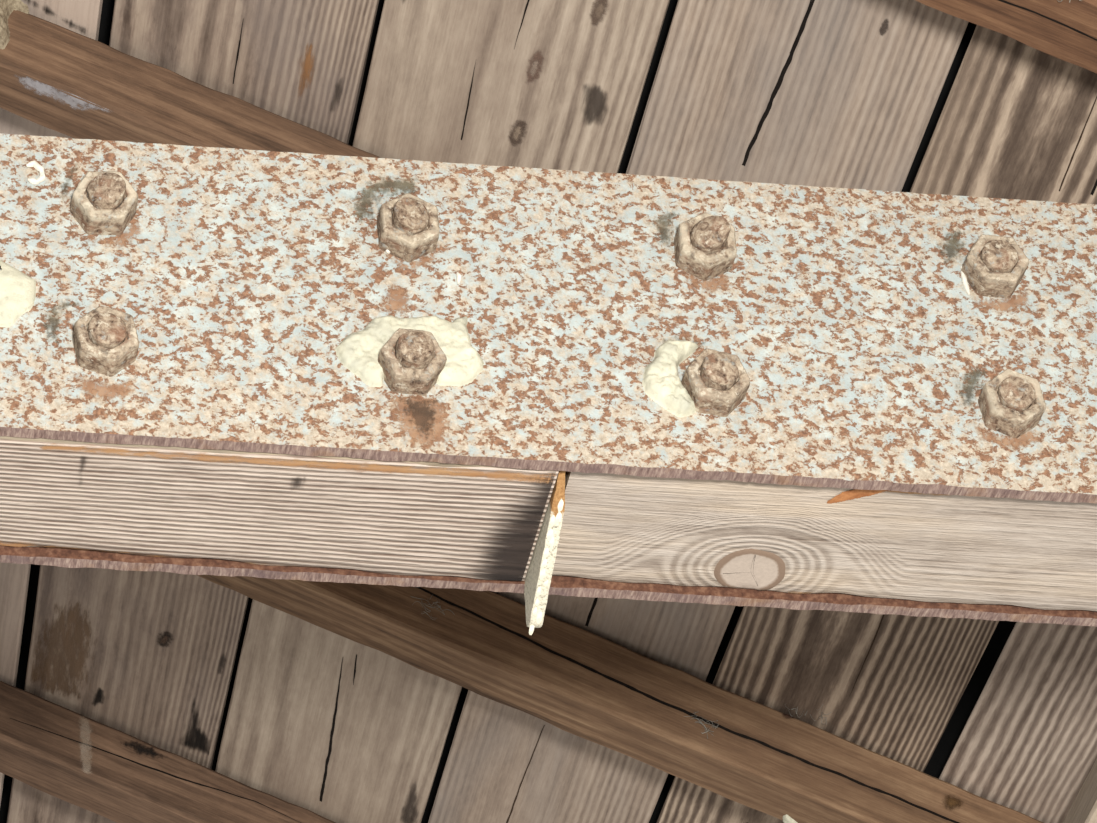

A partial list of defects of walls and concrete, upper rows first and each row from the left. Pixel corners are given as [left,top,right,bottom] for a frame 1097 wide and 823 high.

crack [998,0,1097,41]
crack [461,62,476,140]
crack [742,0,815,166]
crack [1059,97,1097,191]
corrosion [85,224,140,245]
corrosion [977,292,1032,311]
corrosion [74,373,134,400]
corrosion [390,396,450,446]
corrosion [978,427,1039,448]
leakage [31,604,91,698]
crack [320,655,357,802]
crack [416,587,960,823]